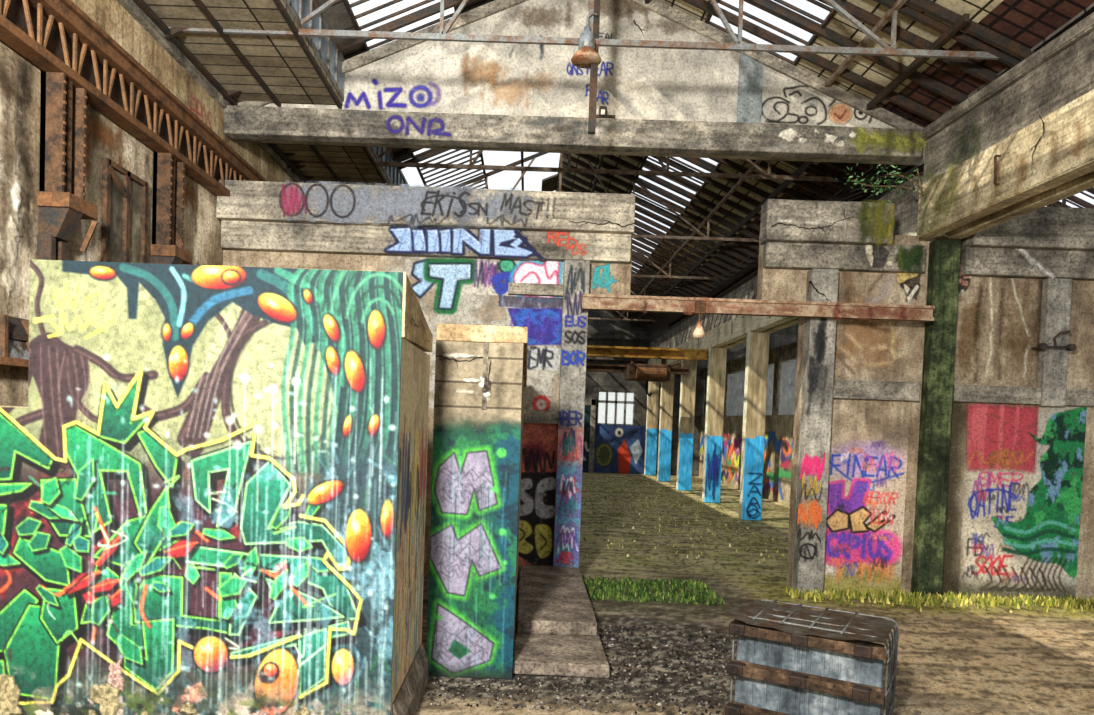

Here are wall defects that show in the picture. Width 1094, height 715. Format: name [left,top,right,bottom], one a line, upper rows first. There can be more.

water stain [0,62,33,288]
corrosion [87,115,121,179]
corrosion [184,184,197,231]
water stain [861,202,926,304]
water stain [839,319,896,371]